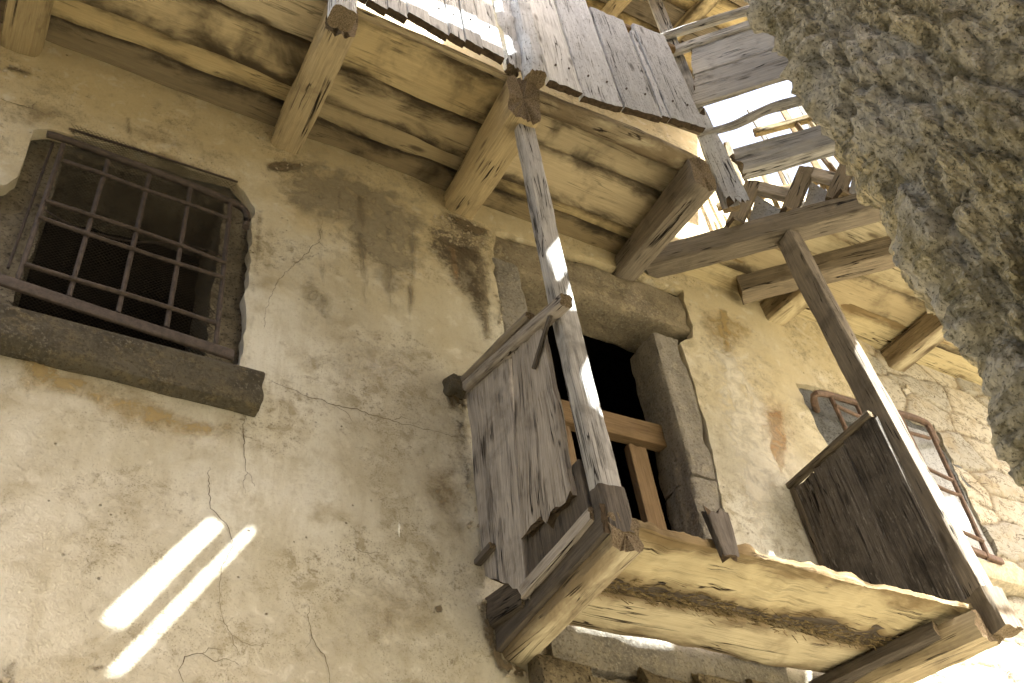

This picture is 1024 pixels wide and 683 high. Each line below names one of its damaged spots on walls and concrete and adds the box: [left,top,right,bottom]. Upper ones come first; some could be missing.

leakage [291,164,489,332]
crack [272,381,455,437]
crack [179,473,270,681]